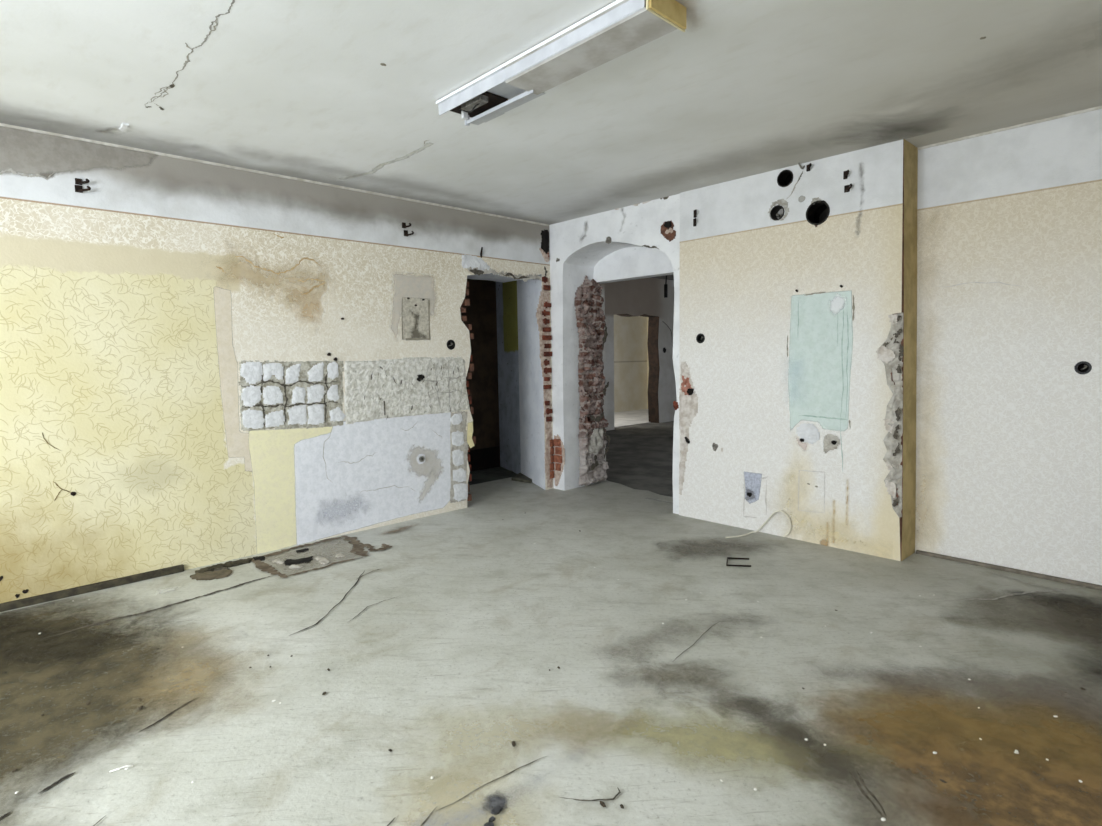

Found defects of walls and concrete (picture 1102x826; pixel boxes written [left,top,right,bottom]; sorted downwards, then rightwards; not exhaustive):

crack [146,0,235,110]
peeling [0,126,156,180]
spalling [539,229,560,262]
flaking render [249,412,451,566]
spalling [460,267,565,501]
spalling [876,312,904,518]
damp [0,599,219,824]